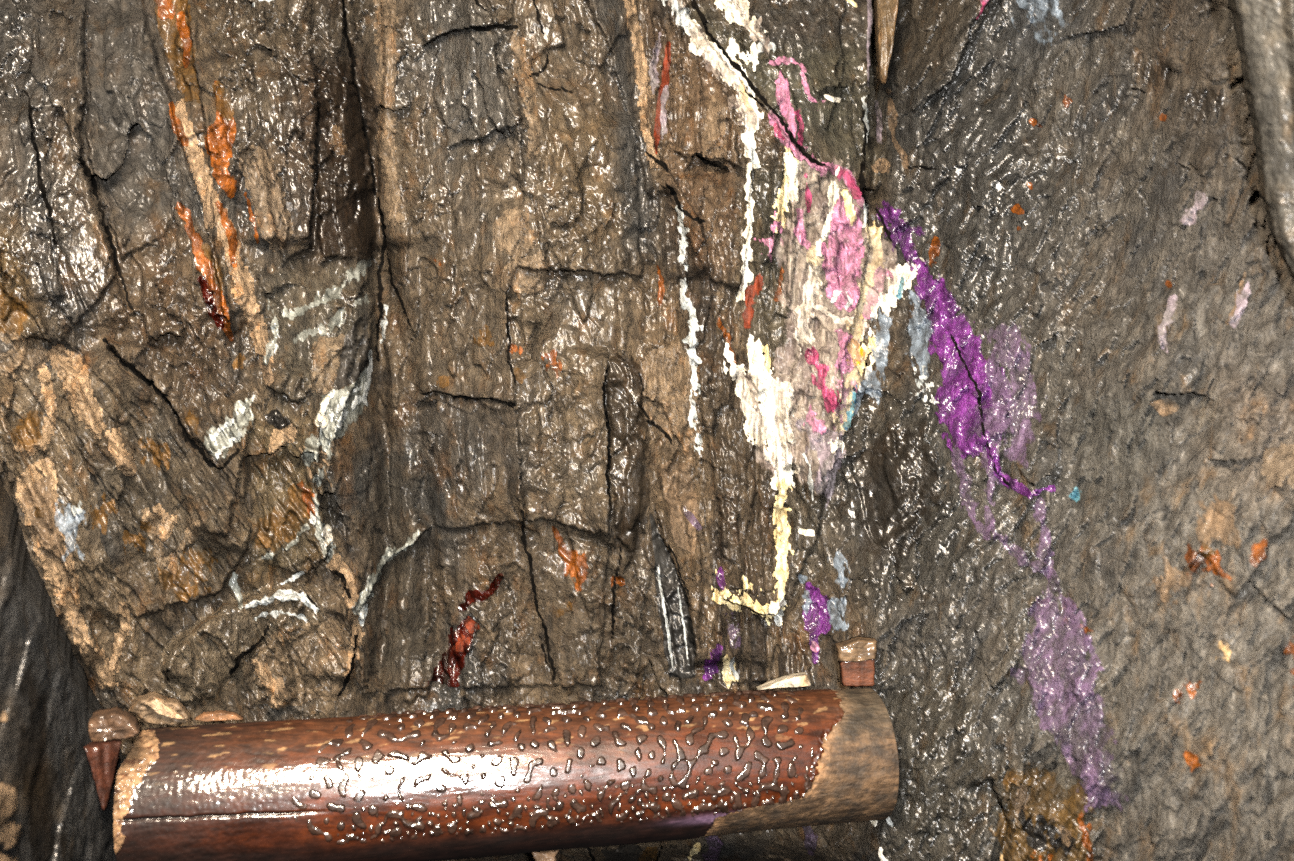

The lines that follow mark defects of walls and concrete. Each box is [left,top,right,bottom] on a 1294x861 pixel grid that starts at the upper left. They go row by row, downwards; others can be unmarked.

crack [23,89,58,246]
crack [76,154,136,315]
corrosion [154,0,259,370]
corrosion [138,438,171,470]
crack [102,338,240,470]
corrosion [184,410,202,435]
crack [420,296,516,408]
corrosion [89,494,118,535]
corrosion [122,521,151,552]
corrosion [157,547,218,602]
corrosion [428,573,504,687]
crack [520,509,556,680]